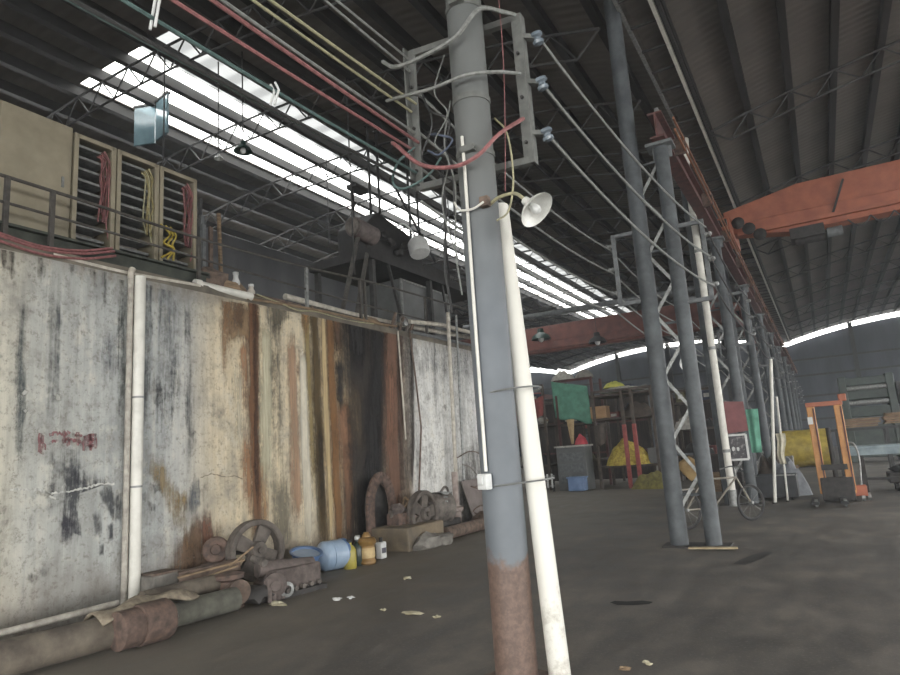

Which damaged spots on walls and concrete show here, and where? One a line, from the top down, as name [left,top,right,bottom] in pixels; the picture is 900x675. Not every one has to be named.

damp [17,310,25,449]
crack [10,482,115,500]
damp [108,300,125,405]
corrosion [222,301,268,532]
corrosion [288,314,352,541]
damp [336,322,387,545]